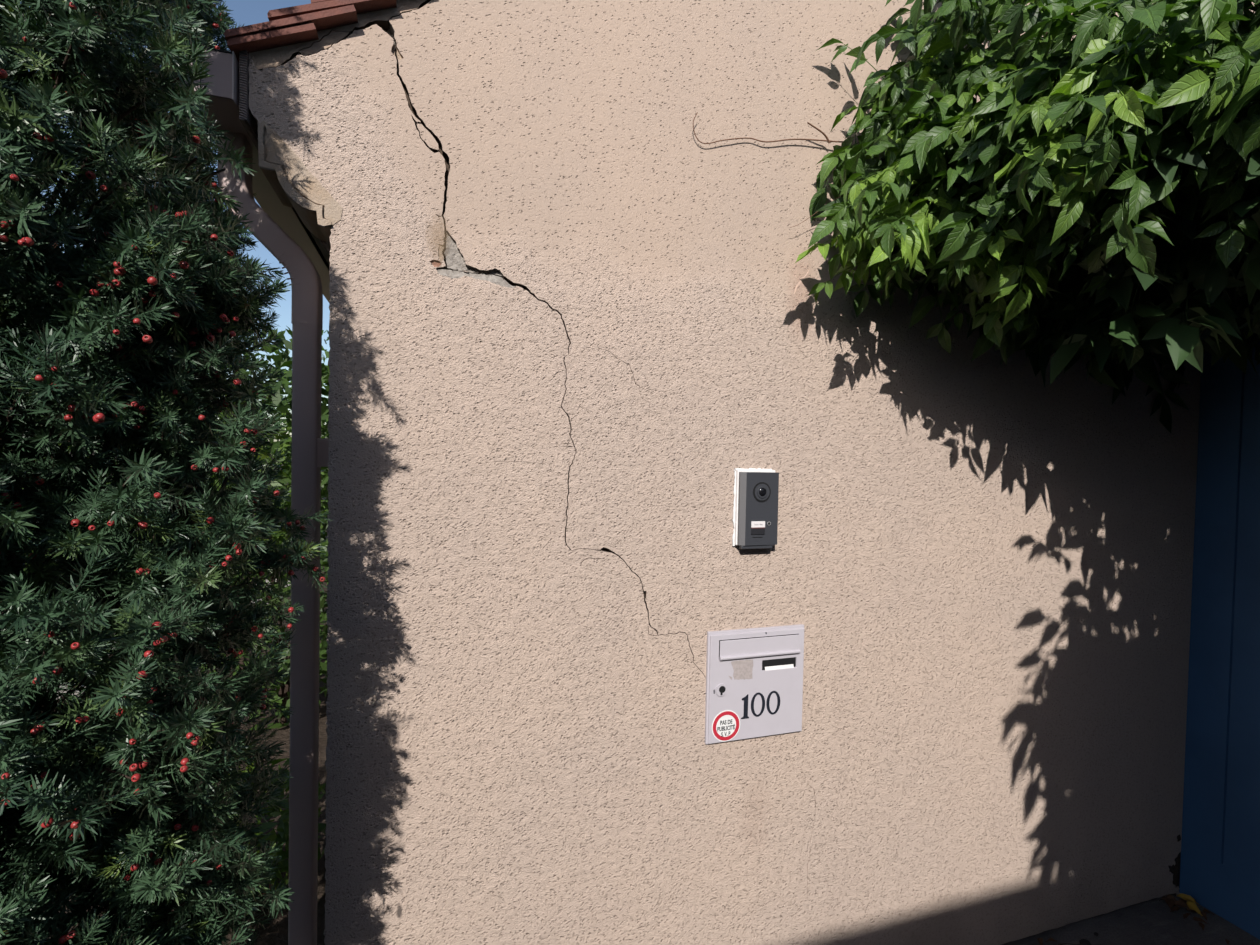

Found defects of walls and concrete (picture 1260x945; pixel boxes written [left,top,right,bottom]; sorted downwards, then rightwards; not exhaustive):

spalling [430,231,515,288]
crack [258,0,705,676]